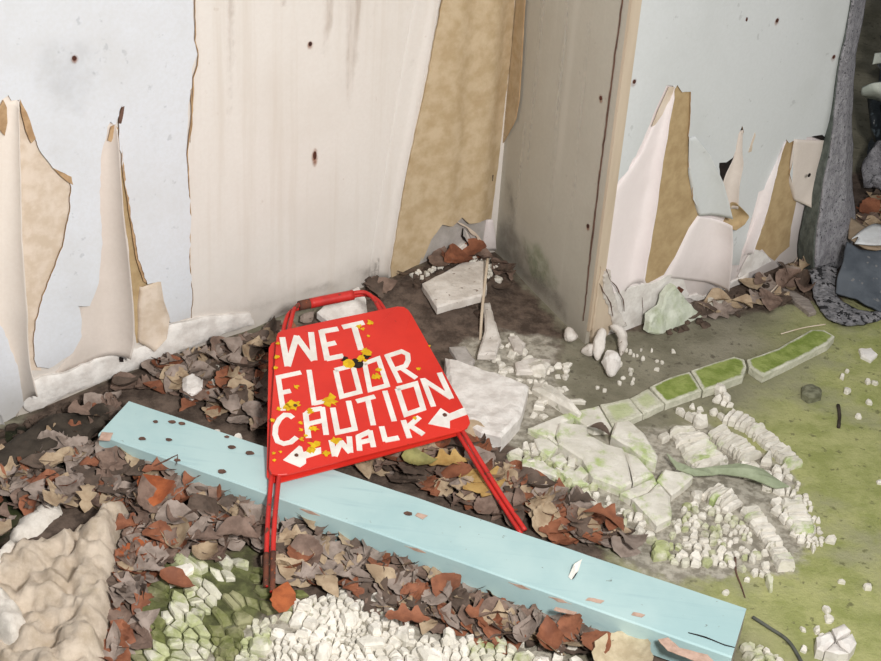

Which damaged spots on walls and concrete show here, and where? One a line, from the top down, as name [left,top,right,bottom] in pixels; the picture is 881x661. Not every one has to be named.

peeling [0,96,255,417]
flaking render [419,218,496,264]
peeling [589,86,825,343]